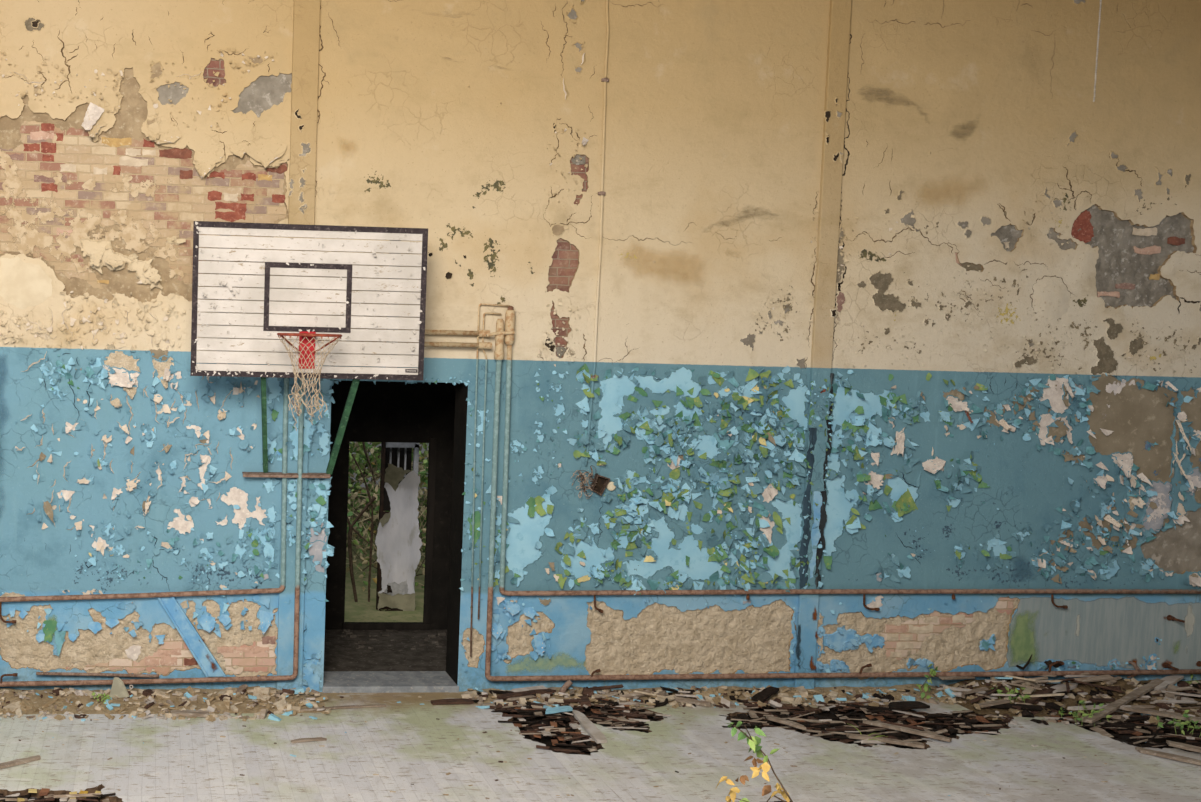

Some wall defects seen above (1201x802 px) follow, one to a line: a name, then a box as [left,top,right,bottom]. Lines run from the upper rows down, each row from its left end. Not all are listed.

crack [6,0,169,93]
crack [180,0,270,72]
crack [541,2,596,197]
crack [805,0,970,369]
crack [1057,167,1076,210]
crack [957,260,1047,310]
crack [1177,254,1201,312]
spalling [0,47,1201,684]
crack [583,334,638,365]